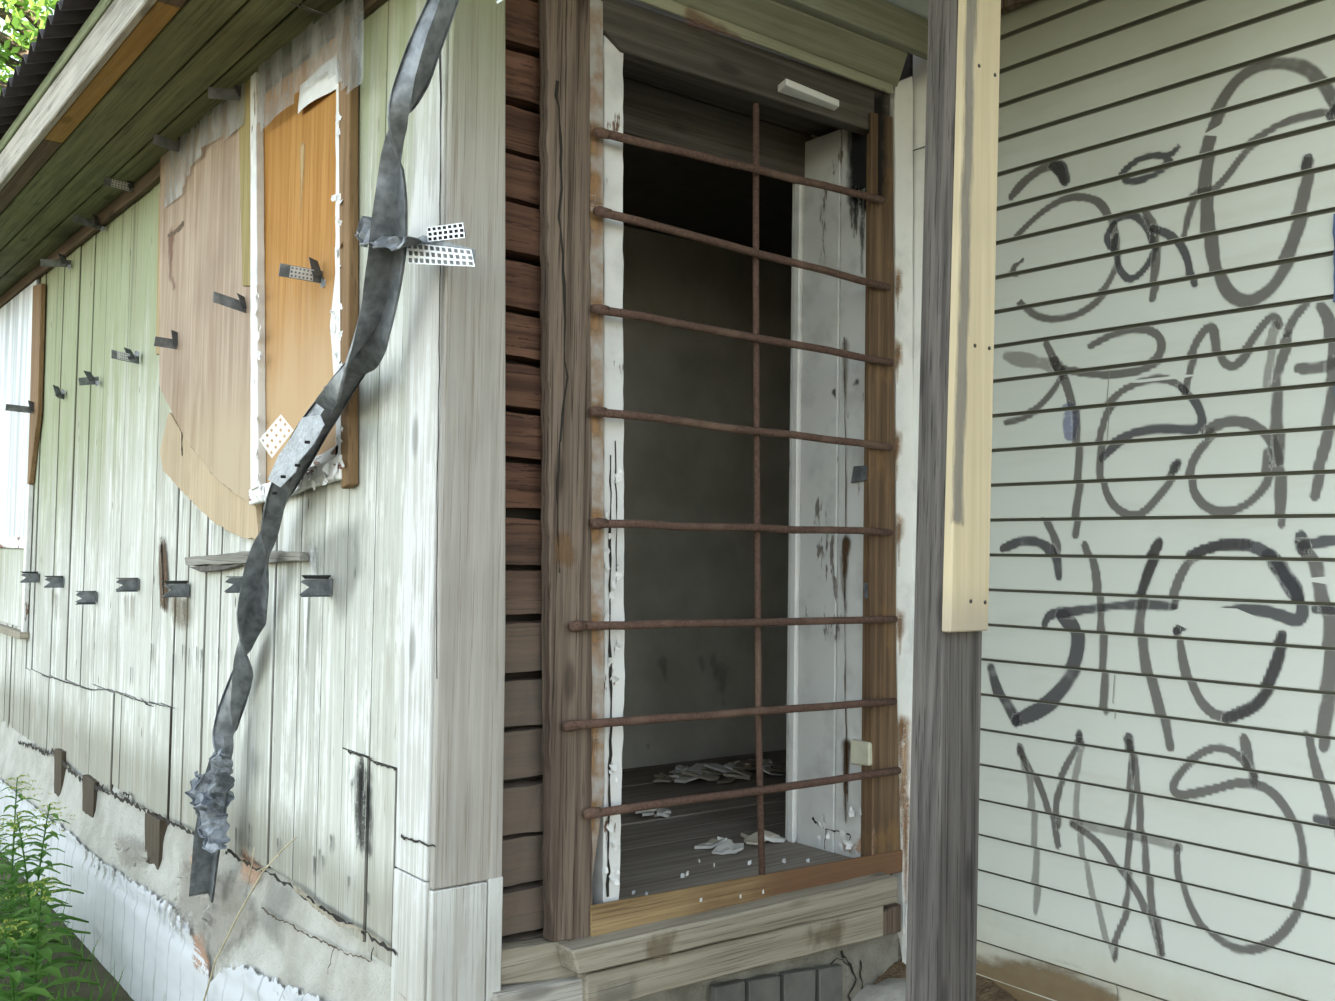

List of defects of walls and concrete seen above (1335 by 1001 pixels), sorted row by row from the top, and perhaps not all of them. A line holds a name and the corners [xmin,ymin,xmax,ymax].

leakage [848,92,886,272]
peeling [330,303,343,369]
peeling [254,449,266,501]
peeling [298,459,344,490]
crack [42,675,175,709]
peeling [604,441,623,897]
leakage [351,756,371,854]
crack [348,750,397,771]
crack [401,834,436,847]
corrosion [899,718,909,875]
spalling [77,837,260,981]
crack [227,849,396,968]